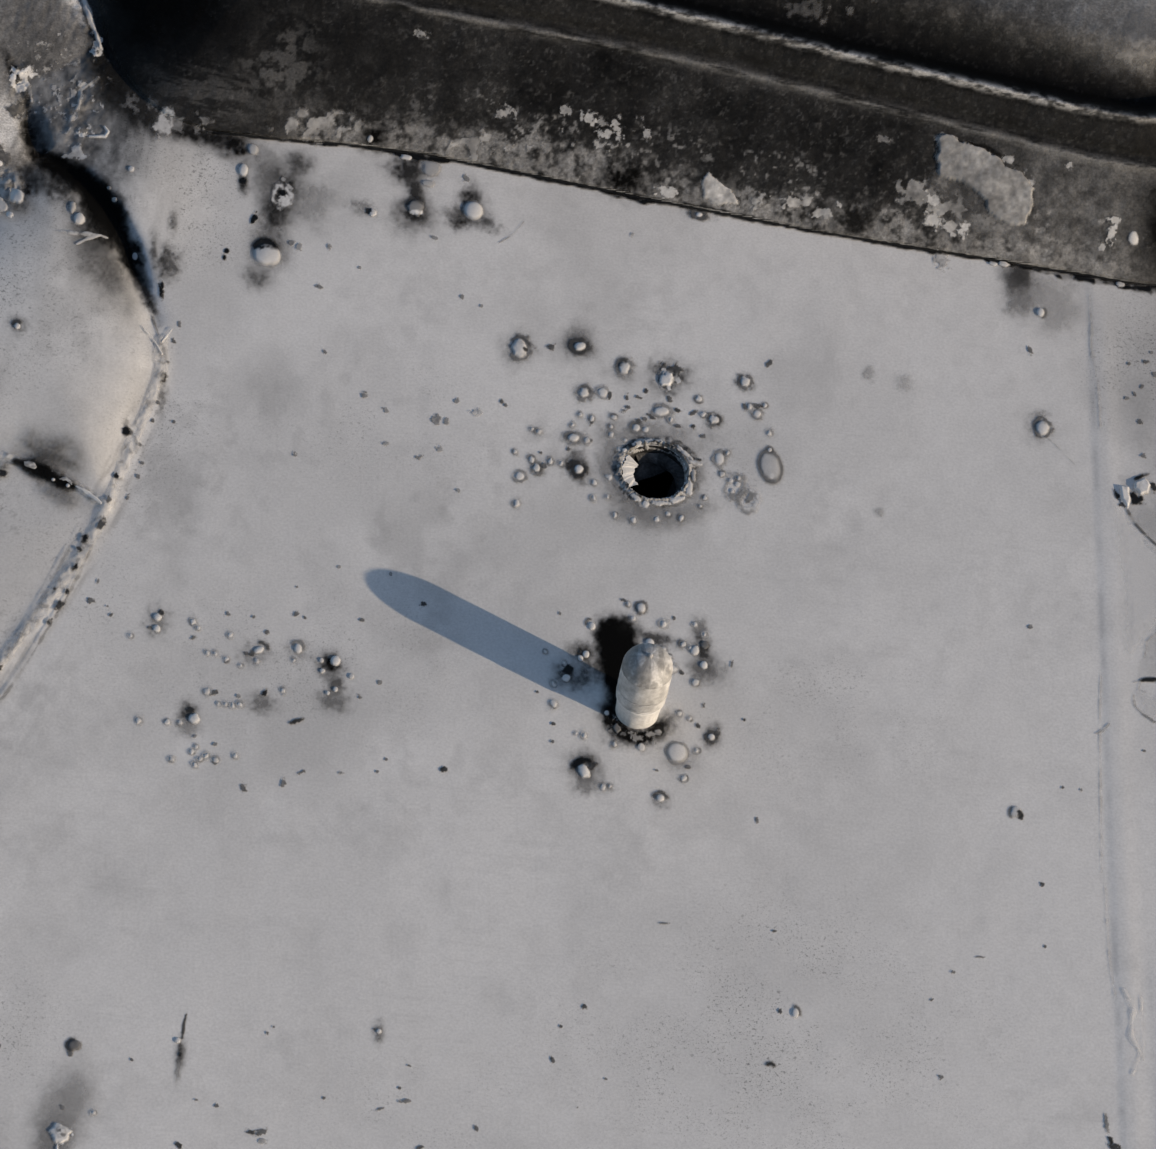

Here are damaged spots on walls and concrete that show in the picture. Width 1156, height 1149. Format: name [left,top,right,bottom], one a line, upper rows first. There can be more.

peeling [923,134,1034,240]
crack [1135,677,1156,722]